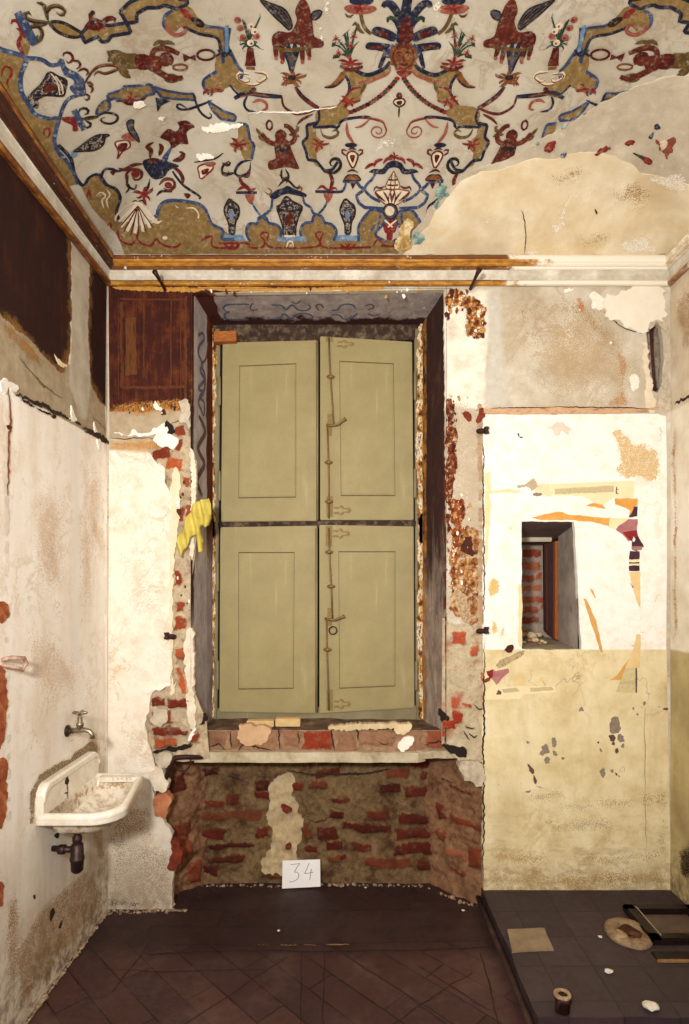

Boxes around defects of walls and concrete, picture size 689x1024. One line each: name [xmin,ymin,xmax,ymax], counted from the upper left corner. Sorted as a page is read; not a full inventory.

crack [249,106,337,114]
peeling [394,74,689,255]
peeling [444,288,487,339]
peeling [579,291,604,311]
flaking render [0,378,19,553]
flaking render [93,327,217,819]
flaking render [0,601,10,624]
flaking render [0,661,11,829]
flaking render [167,837,185,871]